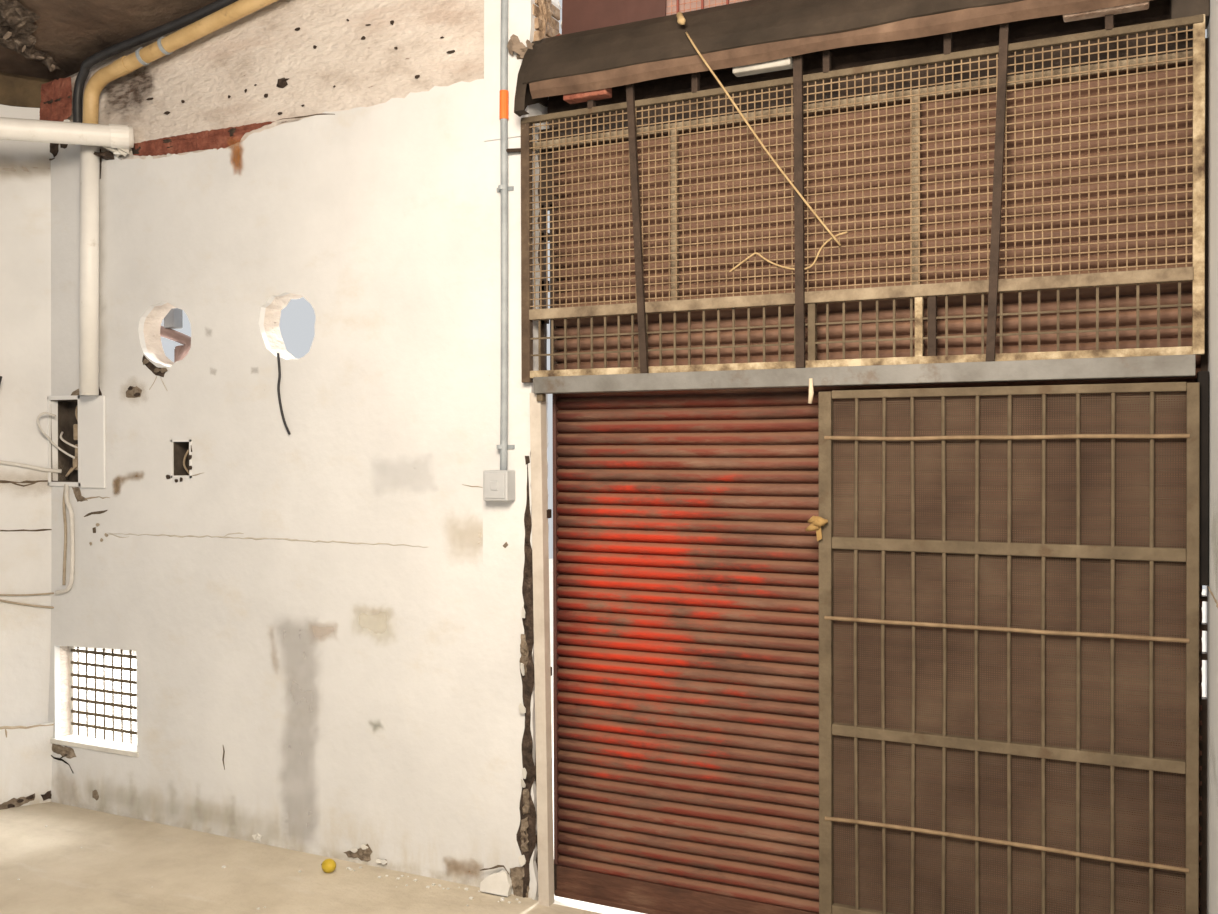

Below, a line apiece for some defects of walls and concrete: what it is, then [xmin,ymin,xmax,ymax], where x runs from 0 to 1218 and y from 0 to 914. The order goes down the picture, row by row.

spalling [0,0,192,122]
flaking render [94,0,484,179]
spalling [50,143,74,157]
flaking render [142,303,176,377]
flaking render [264,293,302,360]
flaking render [52,646,76,759]
spalling [480,456,537,898]